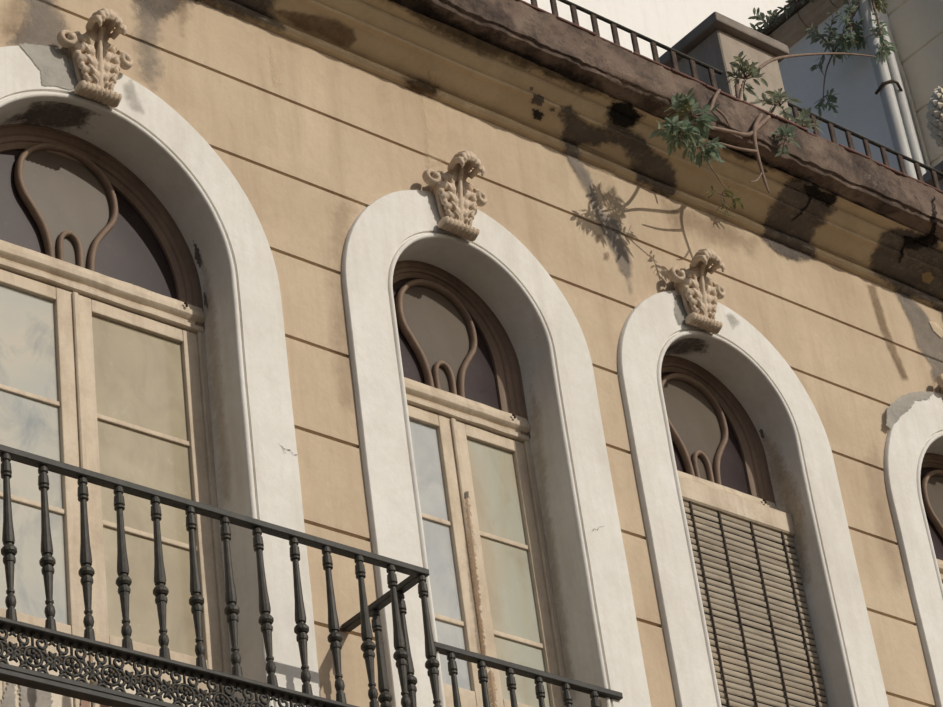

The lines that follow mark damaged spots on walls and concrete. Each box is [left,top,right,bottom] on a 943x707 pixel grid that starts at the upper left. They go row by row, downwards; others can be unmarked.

peeling [20,43,77,90]
water stain [137,0,356,77]
water stain [391,0,599,93]
water stain [9,101,96,129]
water stain [560,102,677,275]
water stain [710,138,838,260]
water stain [870,195,943,381]
peeling [886,391,934,429]
peeling [0,682,53,707]